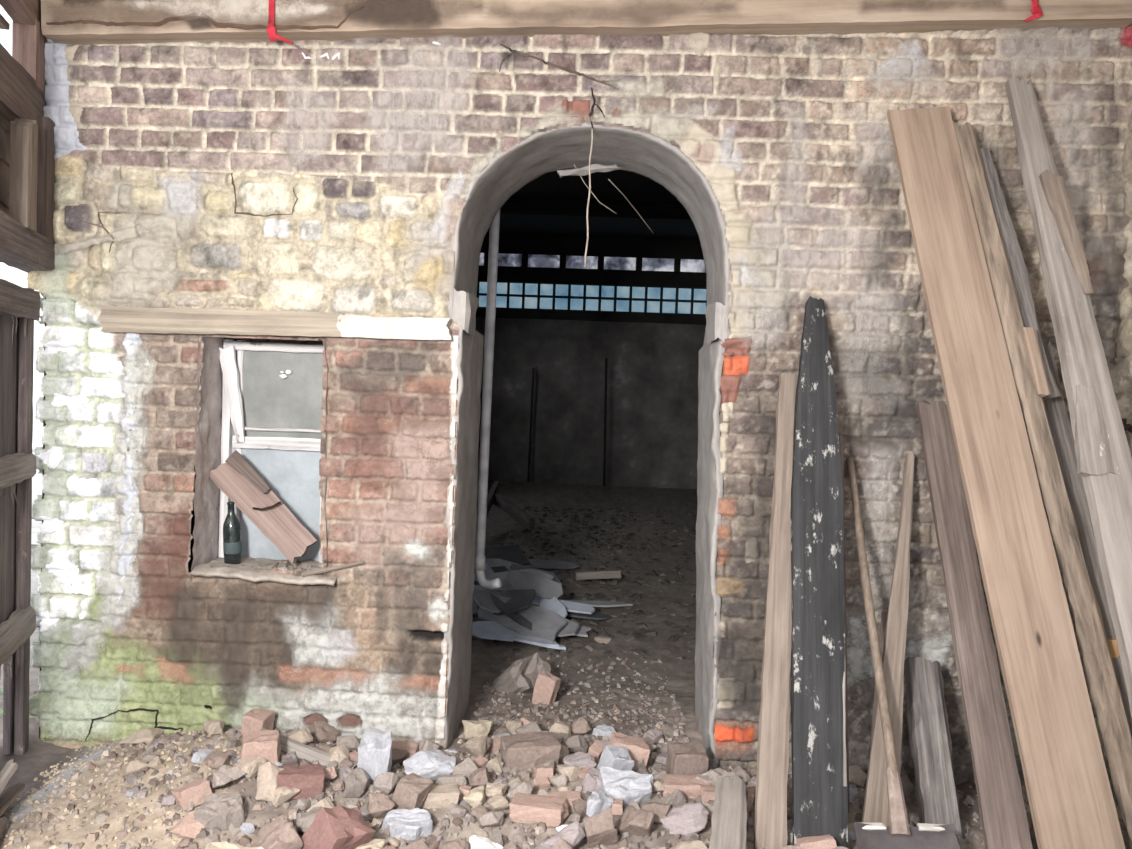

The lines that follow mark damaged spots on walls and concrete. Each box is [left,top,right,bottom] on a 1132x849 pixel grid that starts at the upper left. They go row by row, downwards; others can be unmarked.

water stain [46,0,688,30]
crack [499,43,627,128]
crack [231,173,298,217]
spalling [720,338,752,480]
water stain [405,540,427,558]
spalling [715,499,743,595]
flaking render [744,537,758,563]
water stain [430,599,448,622]
water stain [157,584,441,742]
flaking render [717,677,738,710]
crack [85,708,183,741]